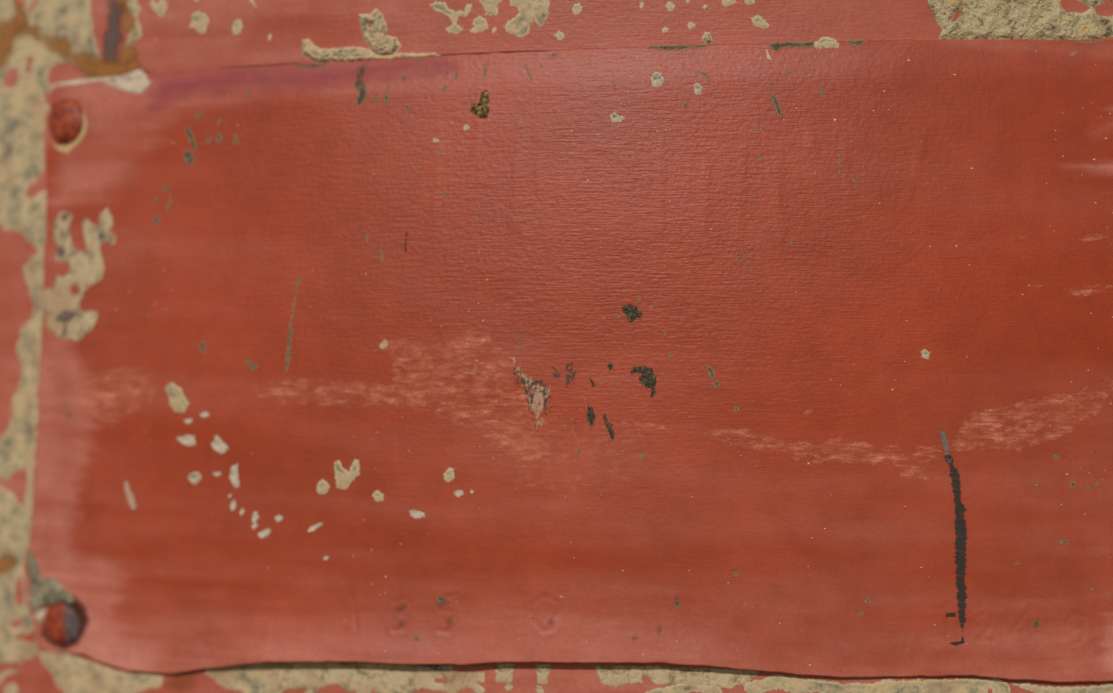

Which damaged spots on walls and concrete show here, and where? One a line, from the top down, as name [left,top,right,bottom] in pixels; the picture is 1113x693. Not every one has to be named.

rust [0,0,140,78]
peeling [302,8,440,106]
peeling [430,0,550,37]
peeling [928,0,1113,56]
peeling [0,0,187,693]
peeling [166,382,215,447]
peeling [211,435,229,454]
peeling [188,463,283,538]
peeling [317,459,360,494]
peeling [443,467,474,497]
peeling [204,662,515,693]
peeling [594,664,1113,693]